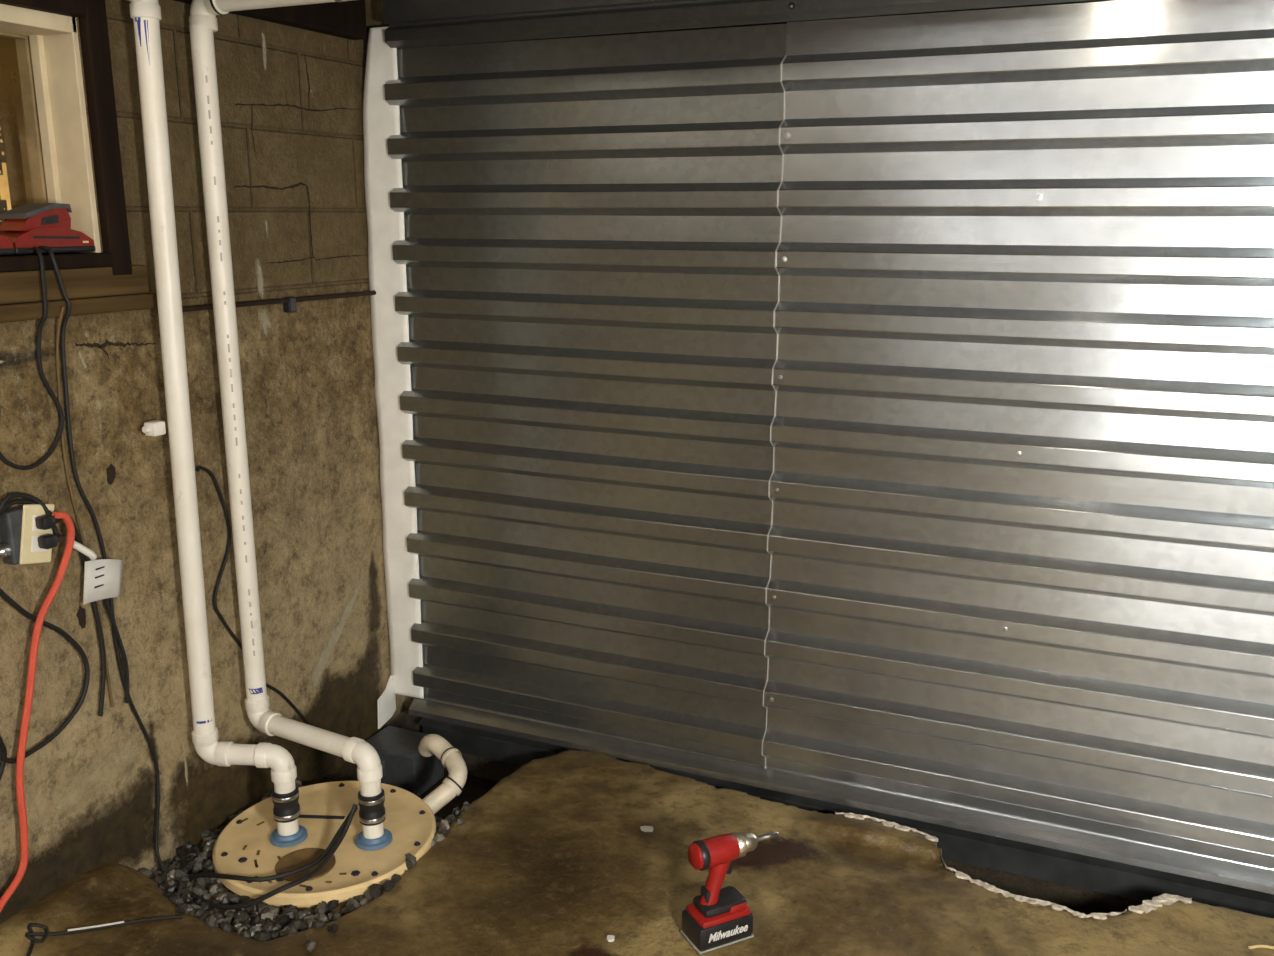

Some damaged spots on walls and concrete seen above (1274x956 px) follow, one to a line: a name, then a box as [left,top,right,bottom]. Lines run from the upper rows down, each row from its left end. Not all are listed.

water stain [297,556,384,741]
water stain [250,733,355,786]
spalling [835,812,1192,920]
water stain [569,945,617,956]